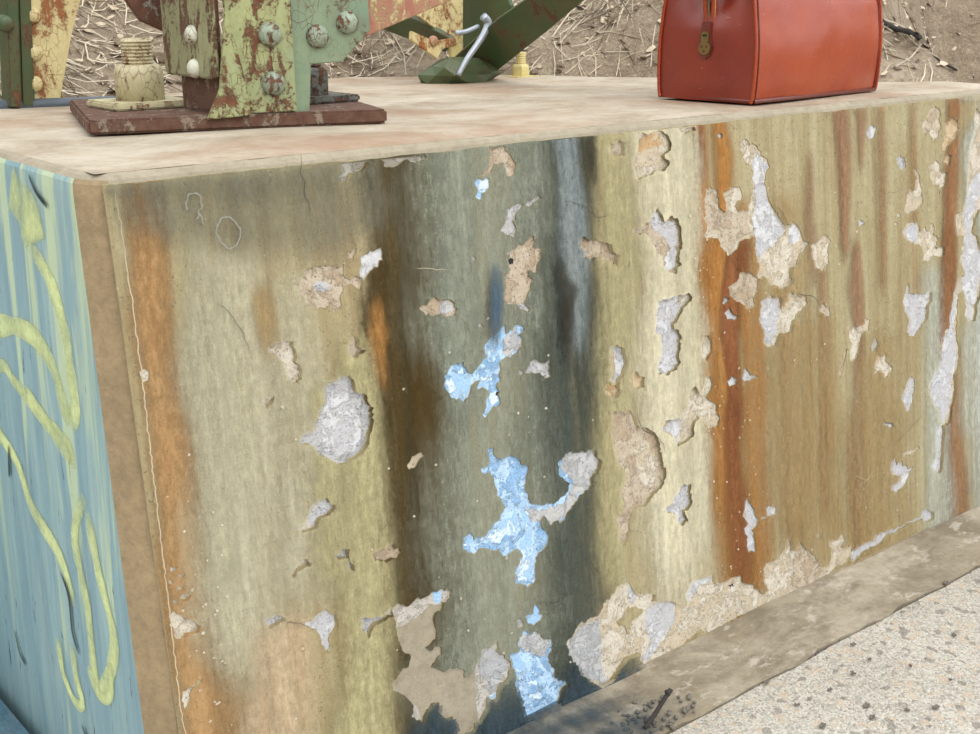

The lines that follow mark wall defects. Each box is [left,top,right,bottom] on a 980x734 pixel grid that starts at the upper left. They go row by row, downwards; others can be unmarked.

rust [124,180,310,734]
rust [369,305,386,380]
damp [124,126,708,734]
peeling [444,325,523,417]
peeling [475,604,566,718]
peeling [462,448,598,587]
rust [692,122,771,589]
peeling [566,509,931,686]
peeling [704,139,830,347]
rust [938,98,961,362]
peeling [928,110,980,473]
rust [948,380,969,518]